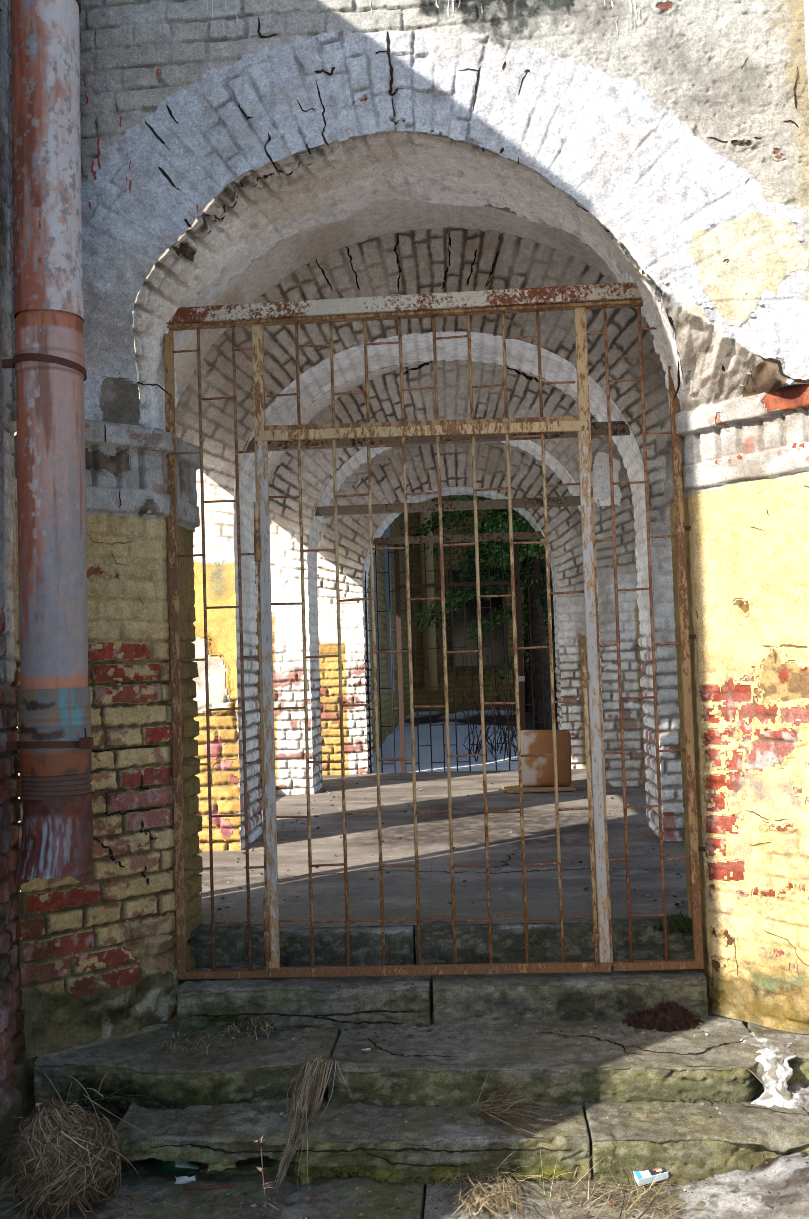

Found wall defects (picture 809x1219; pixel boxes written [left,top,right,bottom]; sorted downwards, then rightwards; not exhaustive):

damp [419,0,641,46]
crack [375,31,405,130]
crack [145,104,180,190]
crack [184,67,335,241]
crack [316,247,360,291]
crack [393,234,401,291]
crack [442,233,499,289]
peeling [663,212,809,432]
peeling [88,642,162,705]
peeling [90,765,174,859]
peeling [697,647,809,910]
crack [529,1032,744,1055]